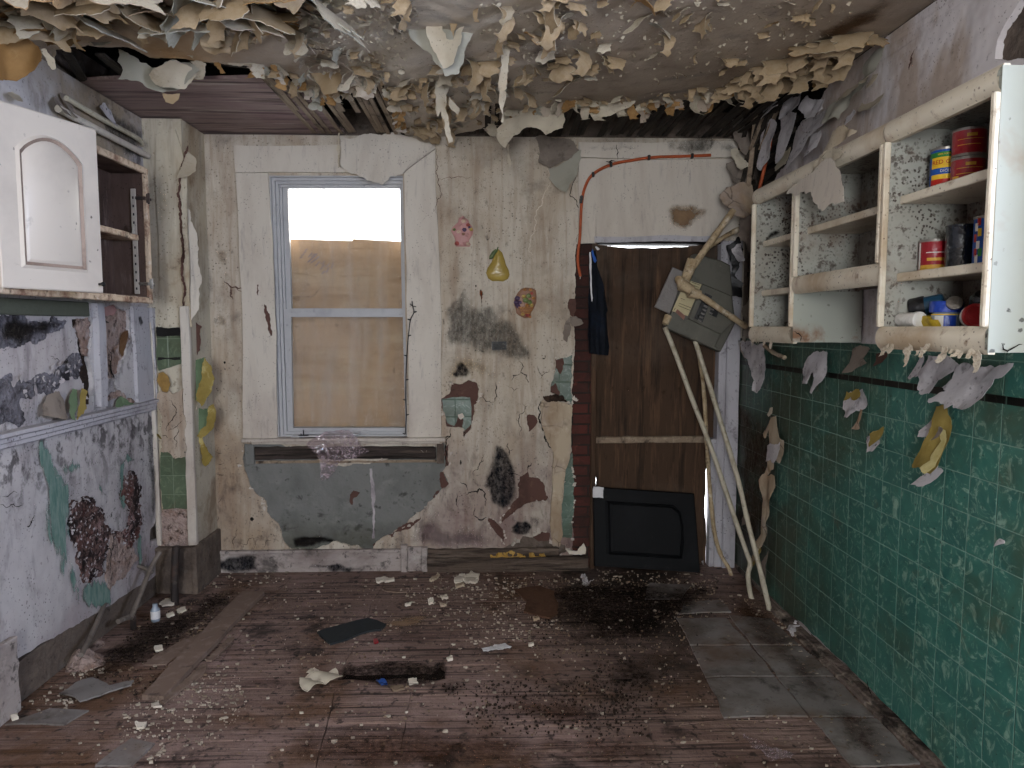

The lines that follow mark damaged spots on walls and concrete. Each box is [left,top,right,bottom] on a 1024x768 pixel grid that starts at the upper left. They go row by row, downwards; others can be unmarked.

crack [177,146,188,306]
peeling [0,0,890,362]
damp [671,206,703,227]
spalling [0,301,135,427]
peeling [157,388,187,459]
flaking render [238,443,453,549]
peeling [441,379,483,439]
crack [445,430,487,521]
damp [449,301,528,357]
damp [487,448,515,507]
crack [481,361,551,476]
peeling [543,299,583,405]